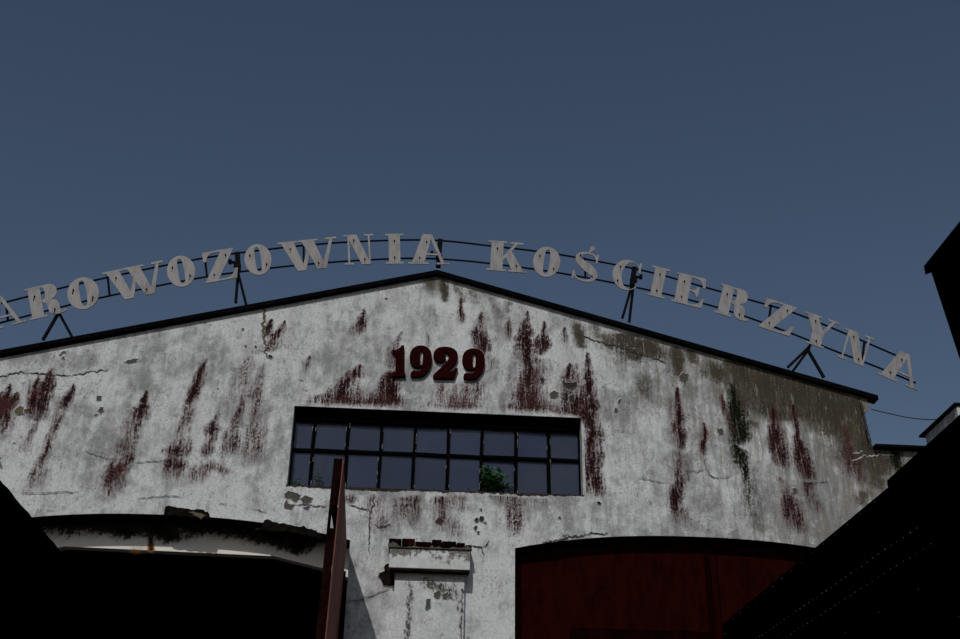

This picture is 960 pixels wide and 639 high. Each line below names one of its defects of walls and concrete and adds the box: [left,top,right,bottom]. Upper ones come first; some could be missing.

rust [0,368,75,488]
crack [0,369,107,377]
rust [102,391,149,496]
flaking render [164,506,210,519]
rust [162,319,286,480]
flaking render [255,519,323,539]
flaking render [283,490,314,510]
rust [310,332,403,406]
rust [507,311,606,496]
rust [667,387,689,523]
damp [726,383,767,521]
rust [767,404,820,533]